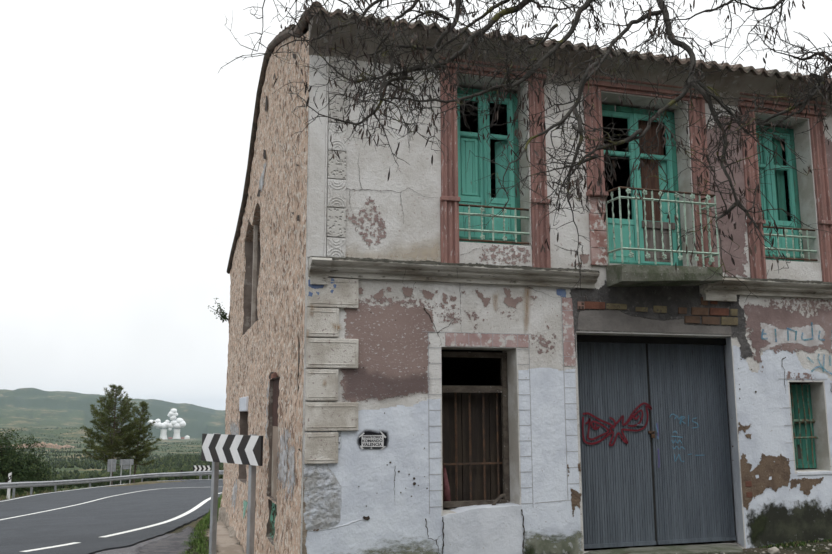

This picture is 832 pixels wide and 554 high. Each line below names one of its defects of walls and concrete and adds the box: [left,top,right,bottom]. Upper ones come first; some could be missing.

crack [346,158,436,224]
peeling [346,197,387,246]
peeling [479,244,530,265]
peeling [498,288,537,321]
peeling [340,287,490,402]
peeling [529,325,556,354]
peeling [684,297,832,370]
spalling [732,453,824,510]
spalling [302,464,342,554]
crack [425,517,444,554]
water stain [746,499,832,548]